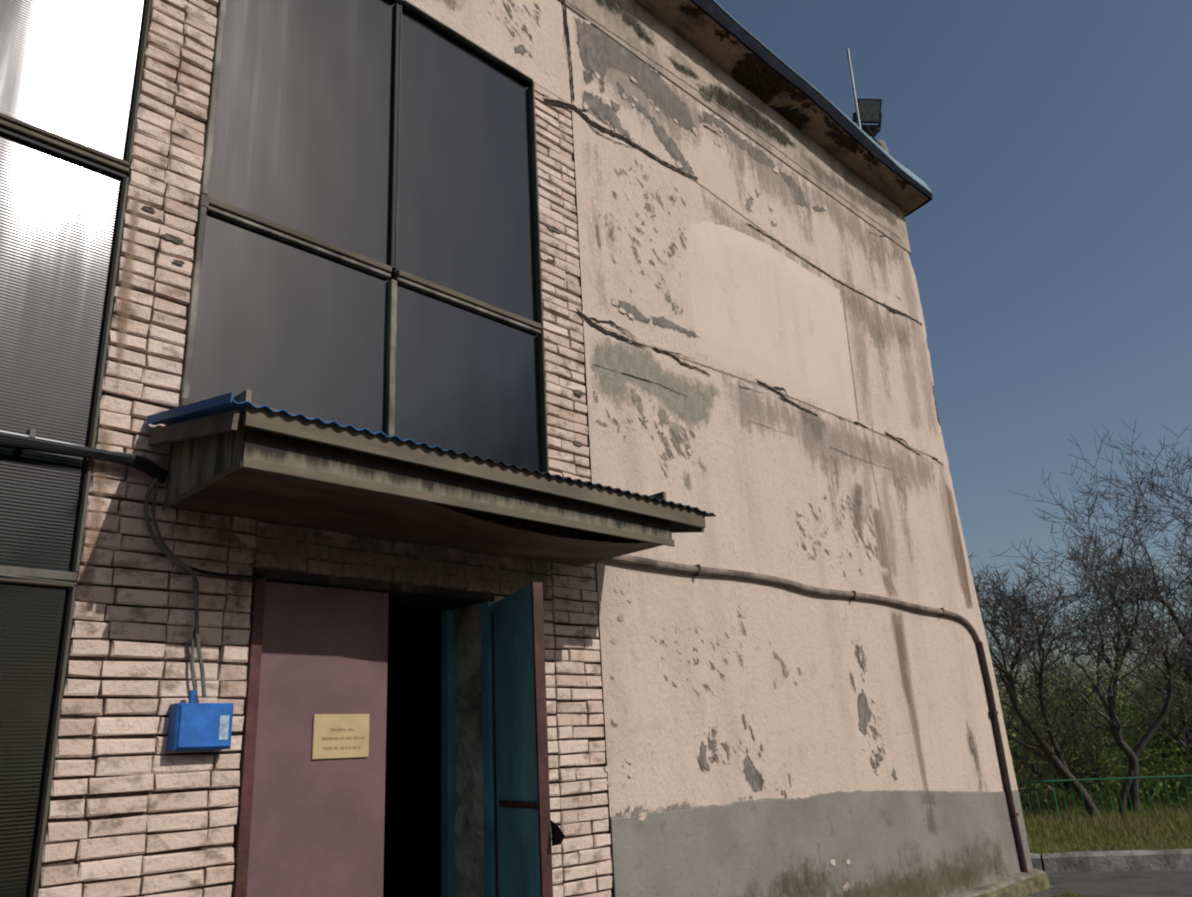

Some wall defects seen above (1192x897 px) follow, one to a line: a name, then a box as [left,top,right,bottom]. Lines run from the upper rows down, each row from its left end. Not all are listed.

crack [543,0,698,181]
peeling [576,19,828,212]
leakage [670,59,795,147]
peeling [714,29,881,167]
leakage [809,162,898,225]
peeling [596,159,698,337]
crack [576,307,711,397]
leakage [591,339,717,440]
crack [739,378,945,471]
leakage [853,485,862,535]
peeling [697,714,791,800]
peeling [850,641,898,780]